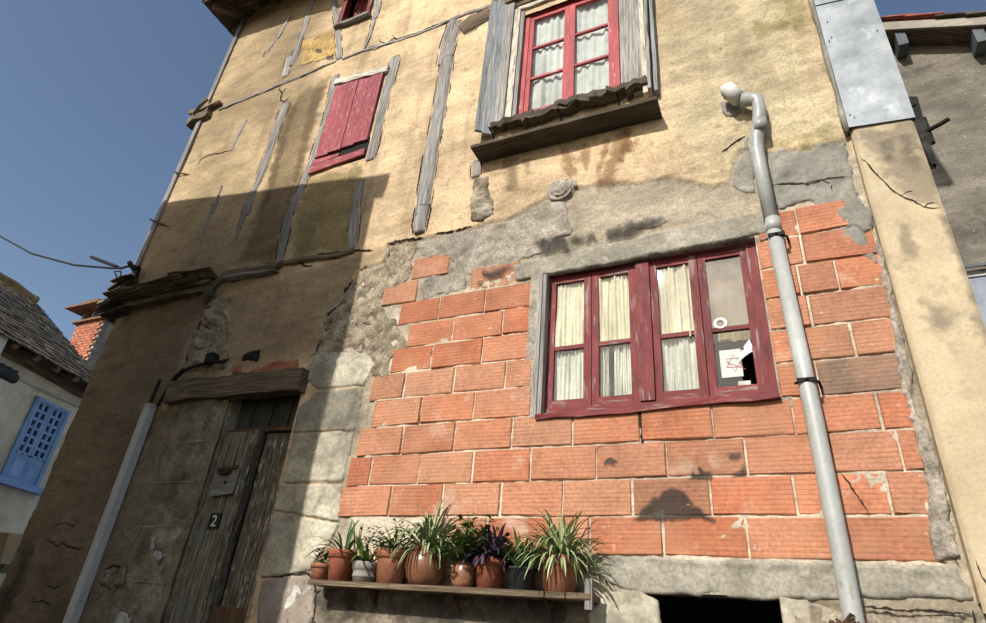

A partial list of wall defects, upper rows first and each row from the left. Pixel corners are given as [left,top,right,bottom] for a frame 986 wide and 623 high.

crack [774,158,942,208]
spalling [312,201,573,378]
spalling [183,293,299,374]
leakage [637,489,713,521]
crack [839,471,869,514]